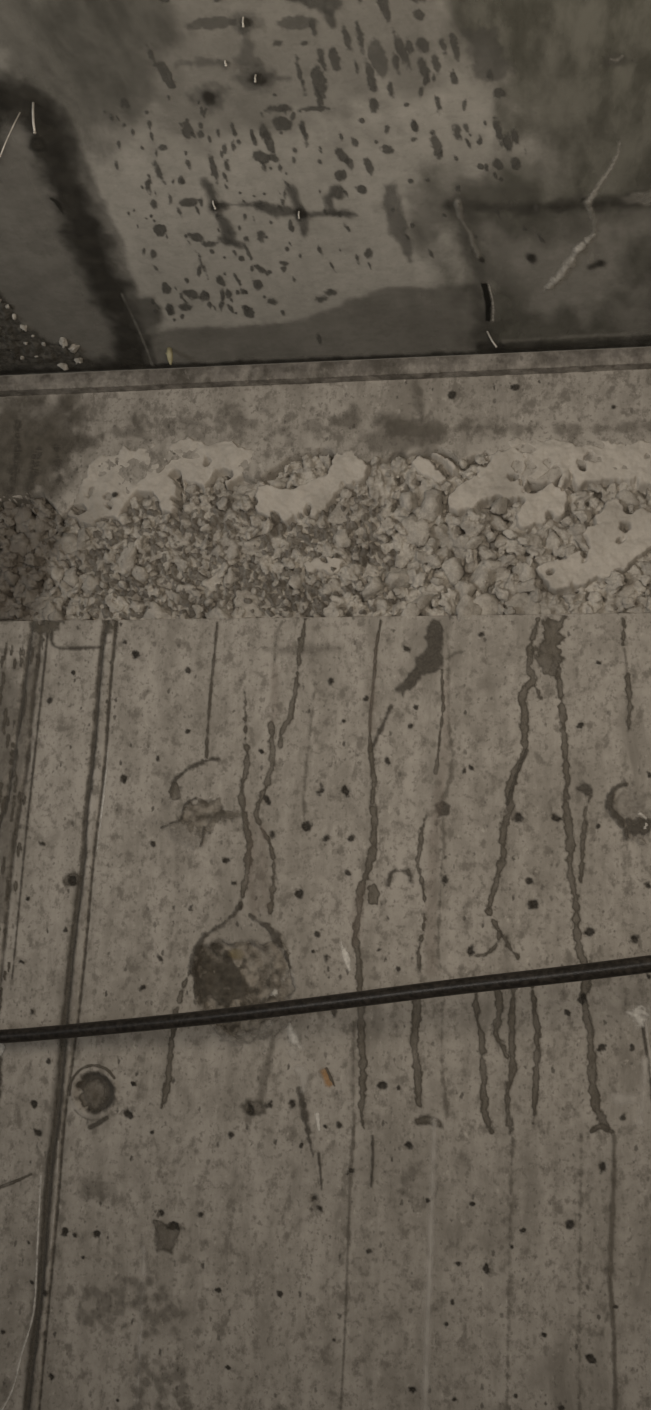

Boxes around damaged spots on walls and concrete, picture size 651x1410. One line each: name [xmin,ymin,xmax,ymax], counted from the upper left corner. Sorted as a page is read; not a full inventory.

damp [0,0,161,369]
damp [242,186,355,235]
flaking render [42,533,100,621]
flaking render [116,518,362,620]
flaking render [327,497,370,548]
flaking render [384,548,433,610]
flaking render [441,514,536,600]
damp [238,618,307,914]
damp [341,620,450,1128]
spalling [189,904,295,1043]
damp [472,615,617,1410]
damp [410,999,442,1184]